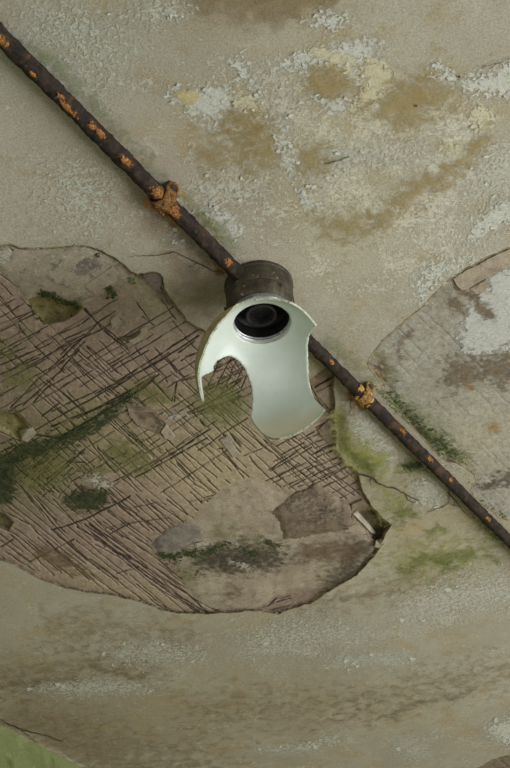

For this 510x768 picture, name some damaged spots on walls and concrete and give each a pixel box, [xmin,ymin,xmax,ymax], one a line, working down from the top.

corrosion [55,92,79,119]
damp [378,77,455,126]
corrosion [88,120,106,139]
damp [369,137,491,226]
corrosion [144,186,188,228]
crack [136,251,224,273]
spalling [367,58,510,521]
spalling [0,128,455,615]
corrosion [347,384,374,415]
crack [358,473,470,517]